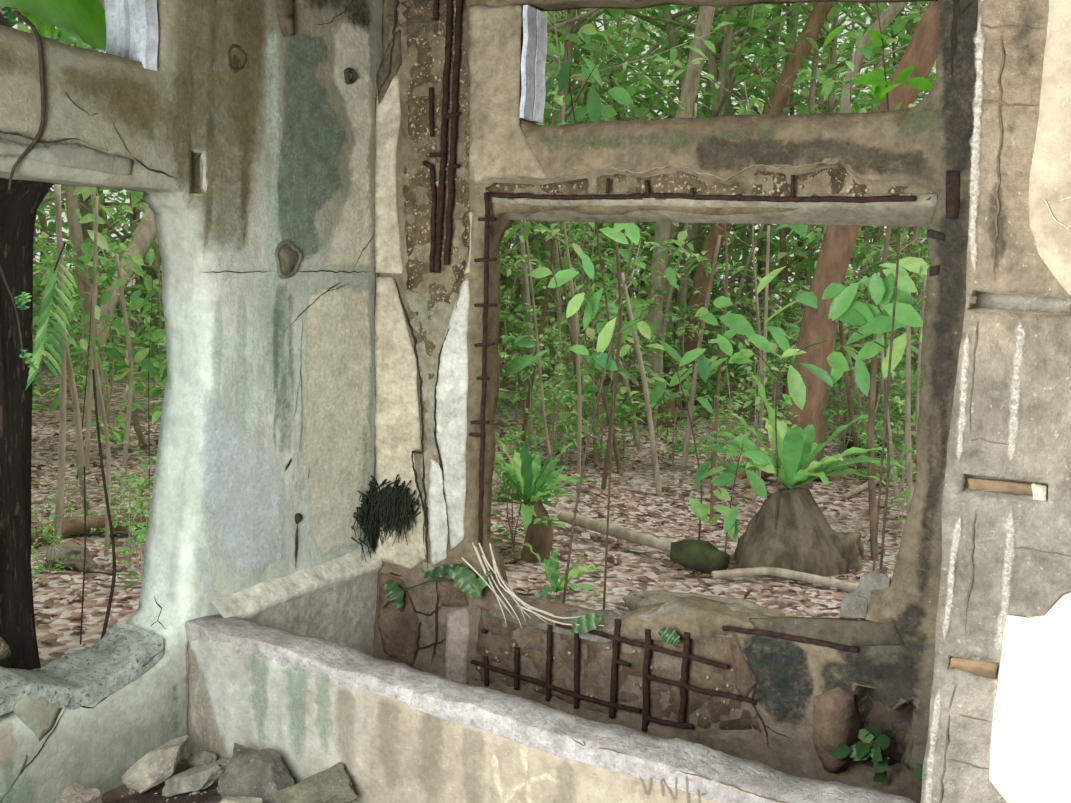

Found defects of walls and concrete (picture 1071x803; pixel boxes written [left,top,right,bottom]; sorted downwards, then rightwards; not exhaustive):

crack [0,93,176,179]
leakage [697,129,924,176]
leakage [900,0,978,174]
crack [950,0,1039,282]
leakage [68,0,372,573]
crack [204,233,459,666]
peeling [375,0,904,733]
leakage [919,200,965,589]
crack [968,321,1013,445]
crack [965,511,976,632]
leakage [743,605,924,754]
crack [939,684,993,803]